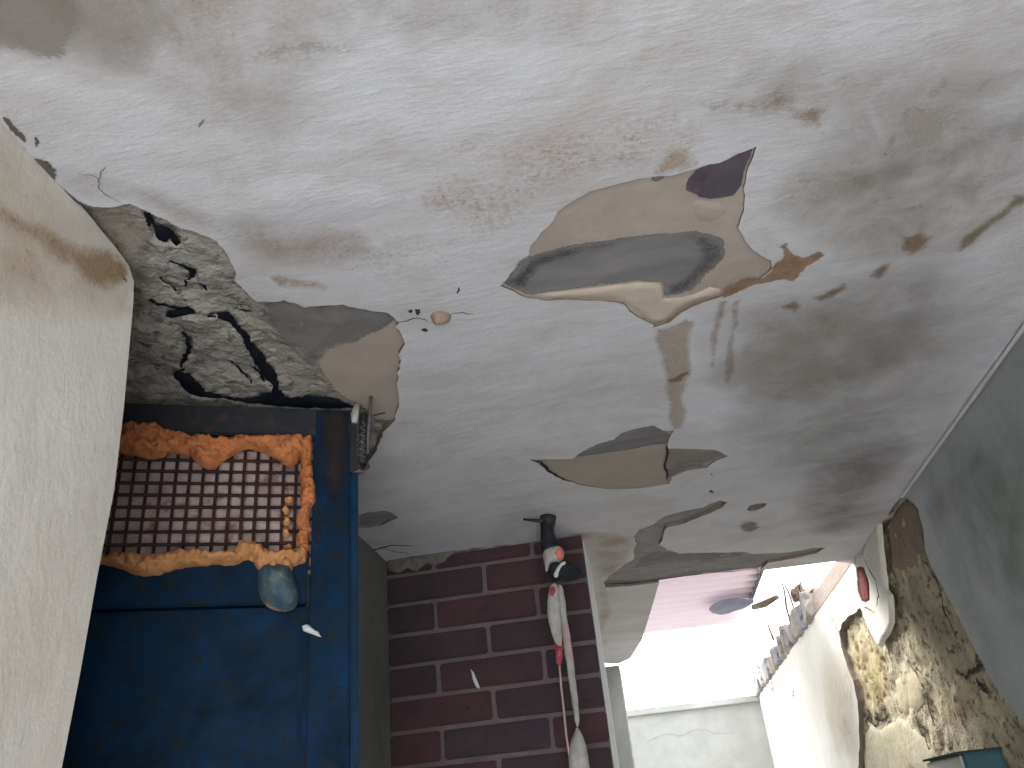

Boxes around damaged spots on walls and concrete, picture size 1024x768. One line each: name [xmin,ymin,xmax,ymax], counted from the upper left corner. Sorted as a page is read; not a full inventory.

water stain [3,210,125,284]
peeling [502,148,771,328]
corrosion [723,243,824,298]
water stain [904,235,927,253]
water stain [963,196,1024,247]
spalling [81,204,404,466]
water stain [659,321,690,427]
peeling [531,425,725,488]
spalling [604,500,819,585]
spalling [847,498,1024,768]